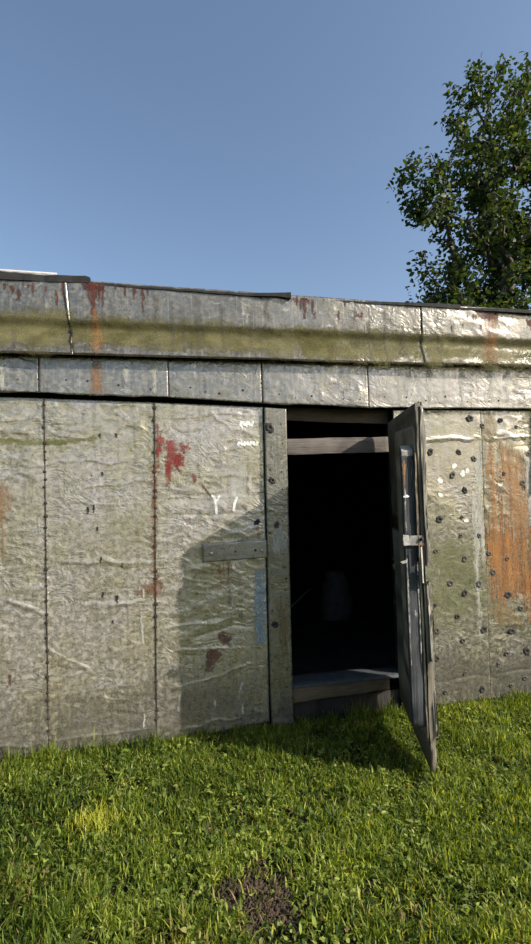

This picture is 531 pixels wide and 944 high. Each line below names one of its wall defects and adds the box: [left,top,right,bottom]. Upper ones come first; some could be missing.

crack [63,282,73,354]
corrosion [82,282,149,316]
corrosion [451,311,499,336]
corrosion [484,412,531,626]